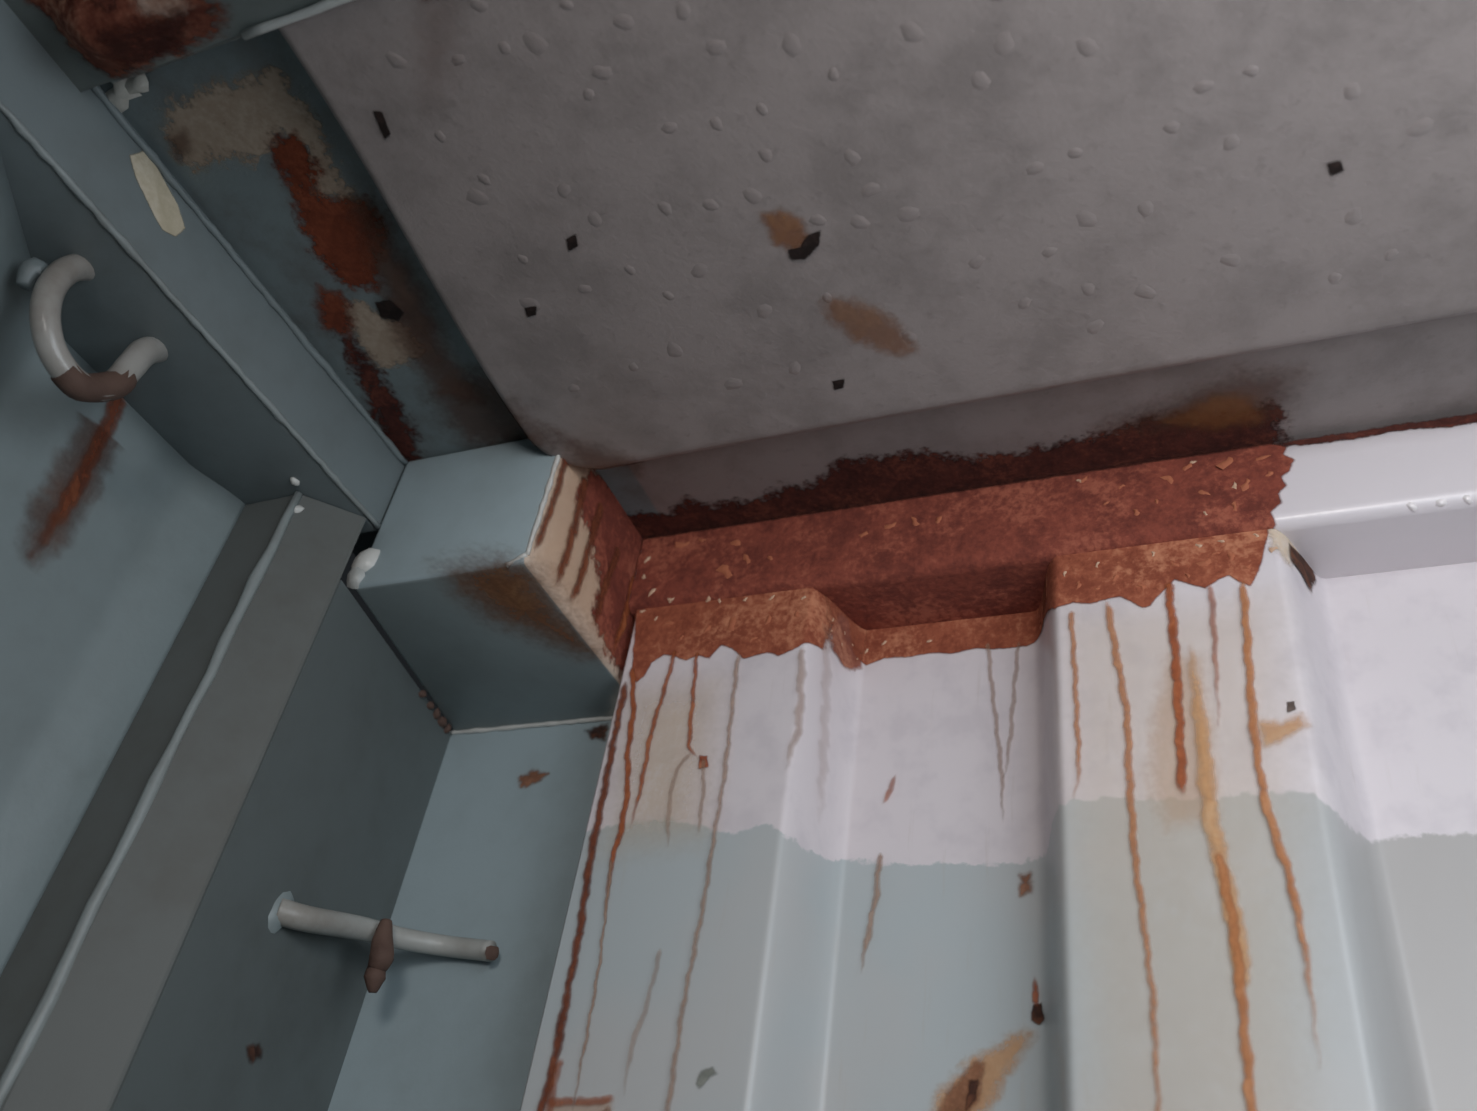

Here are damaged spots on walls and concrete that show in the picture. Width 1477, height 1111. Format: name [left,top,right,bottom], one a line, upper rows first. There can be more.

corrosion [26,0,226,78]
corrosion [270,134,542,472]
corrosion [765,213,820,260]
corrosion [35,365,137,543]
corrosion [452,398,1477,1111]